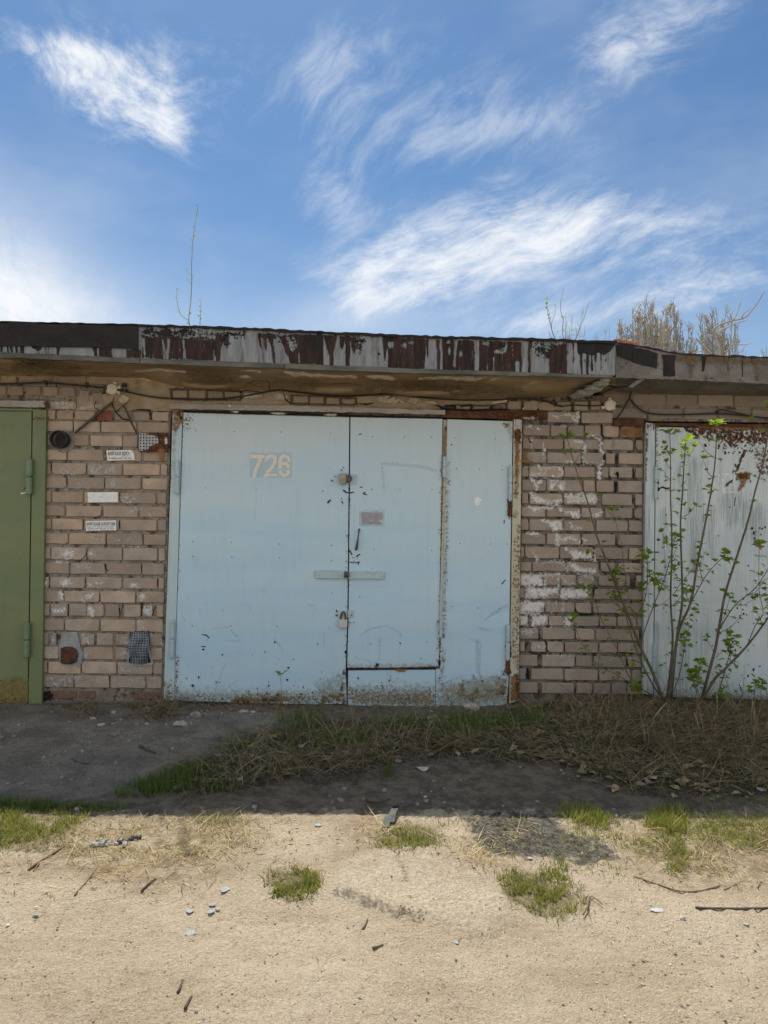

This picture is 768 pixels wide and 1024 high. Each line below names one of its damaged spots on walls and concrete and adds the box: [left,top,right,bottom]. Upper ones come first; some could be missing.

rust [126,334,229,361]
rust [258,333,357,366]
rust [682,423,768,491]
rust [161,411,543,707]
leakage [520,425,604,656]